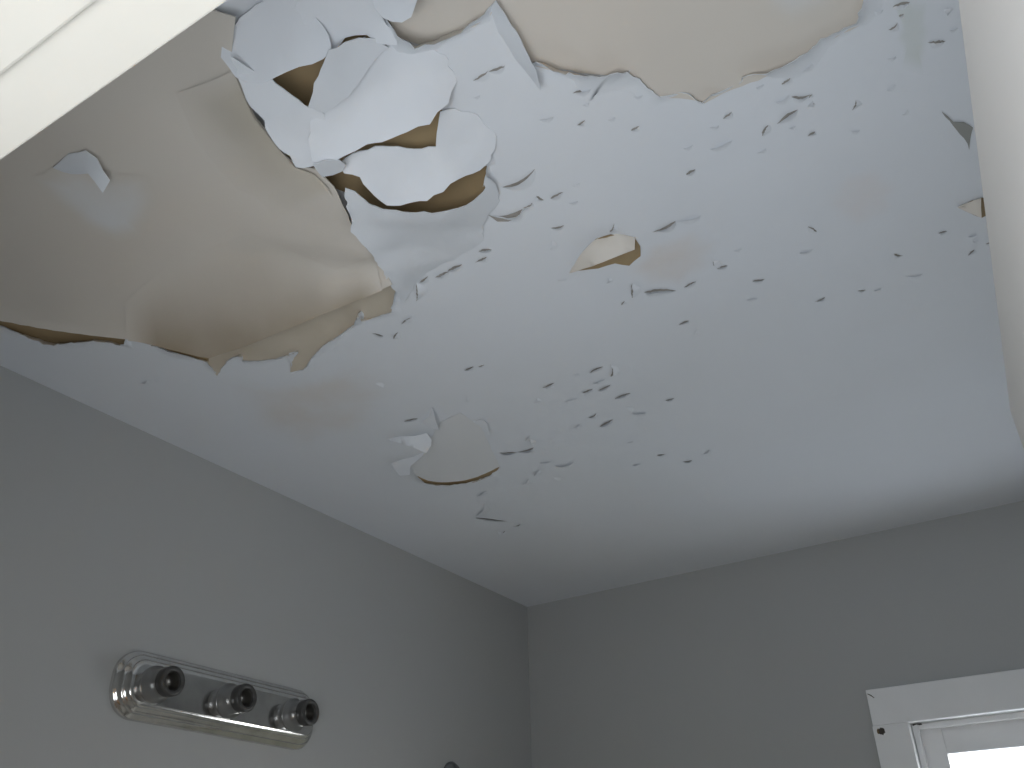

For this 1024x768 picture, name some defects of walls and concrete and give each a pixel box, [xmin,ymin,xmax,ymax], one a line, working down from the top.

peeling [0,0,910,377]
peeling [942,112,973,147]
peeling [958,198,986,218]
peeling [388,397,537,536]